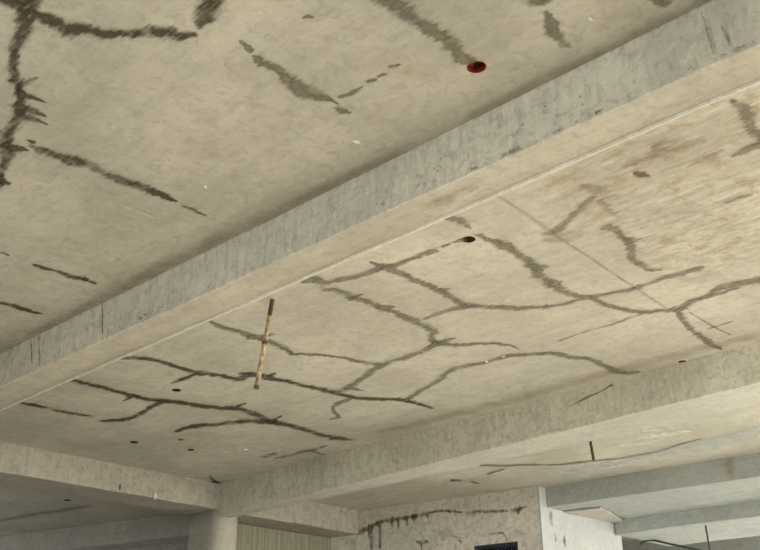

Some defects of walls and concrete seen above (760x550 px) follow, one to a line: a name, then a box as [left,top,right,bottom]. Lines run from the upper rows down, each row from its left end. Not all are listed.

crack [373,0,475,65]
crack [0,0,224,187]
crack [239,40,401,114]
crack [107,173,206,216]
crack [0,302,42,314]
crack [21,234,760,458]
crack [480,439,699,475]
leakage [361,514,418,550]